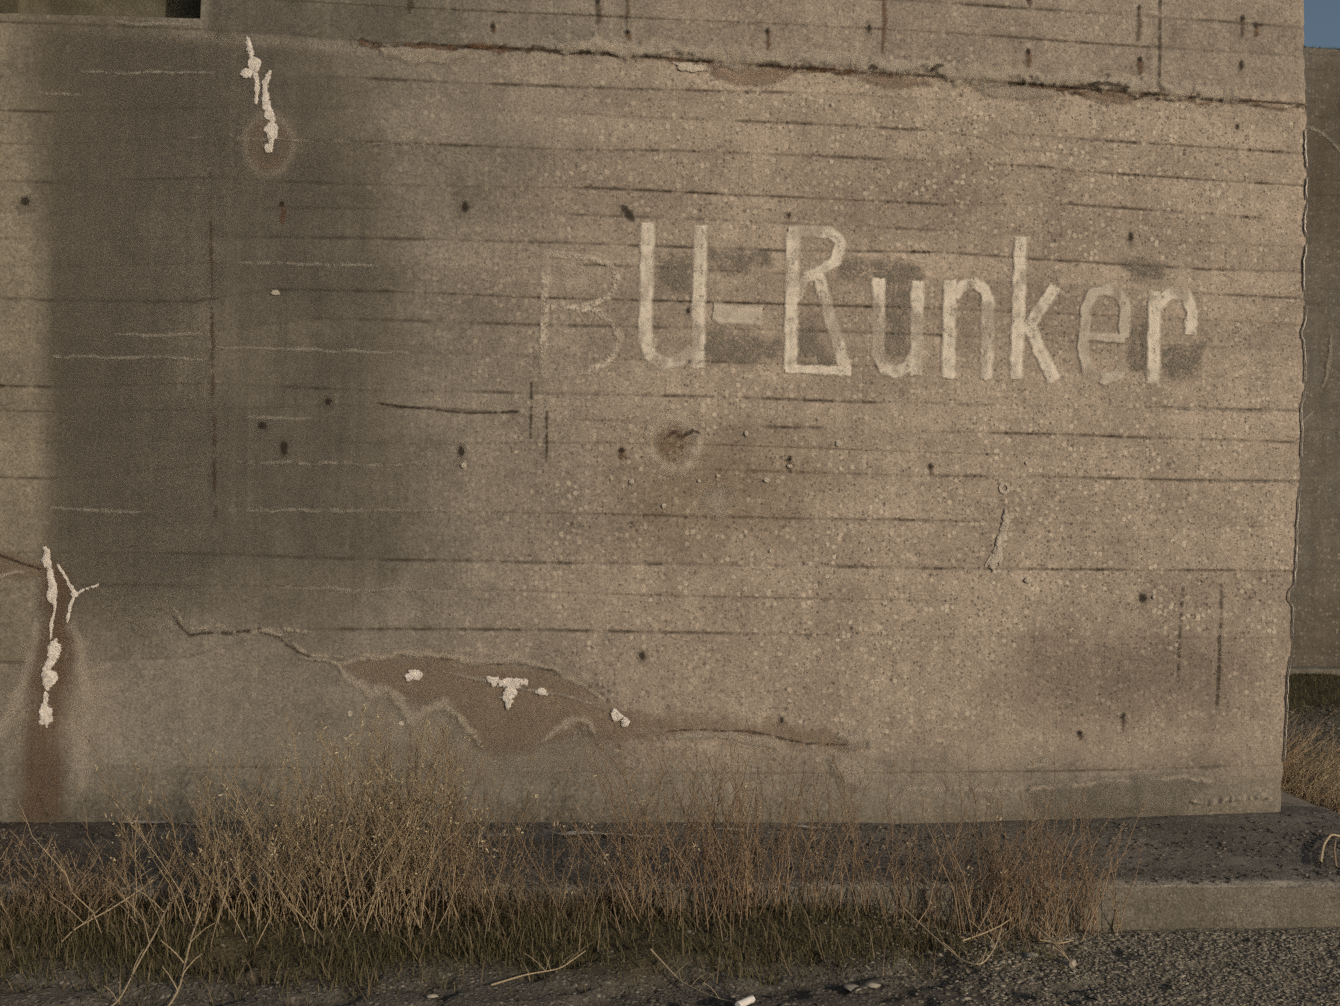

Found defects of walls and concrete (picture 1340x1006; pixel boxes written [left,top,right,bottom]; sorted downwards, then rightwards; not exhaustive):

leakage [203,36,342,312]
crack [360,32,1340,152]
leakage [0,31,147,820]
crack [173,609,343,661]